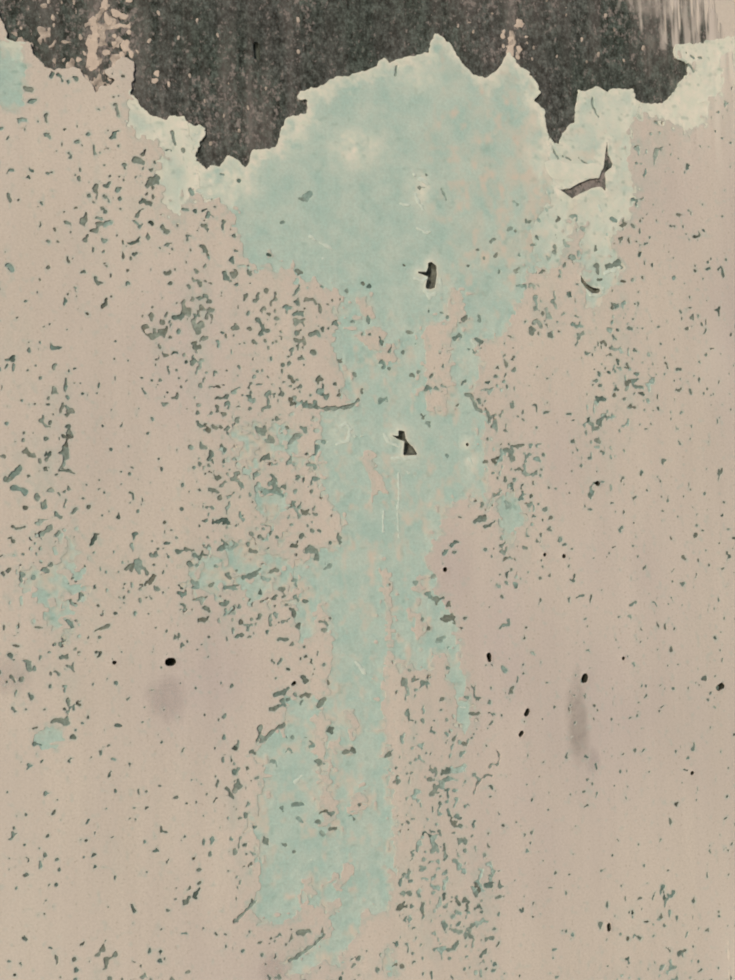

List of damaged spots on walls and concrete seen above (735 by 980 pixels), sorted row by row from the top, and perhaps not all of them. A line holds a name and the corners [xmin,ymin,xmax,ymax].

peeling [15,368,100,476]
peeling [584,471,625,514]
spalling [485,653,525,694]
peeling [8,826,61,887]
peeling [166,857,202,912]
peeling [598,885,678,941]
peeling [89,940,123,980]
peeling [648,928,709,980]